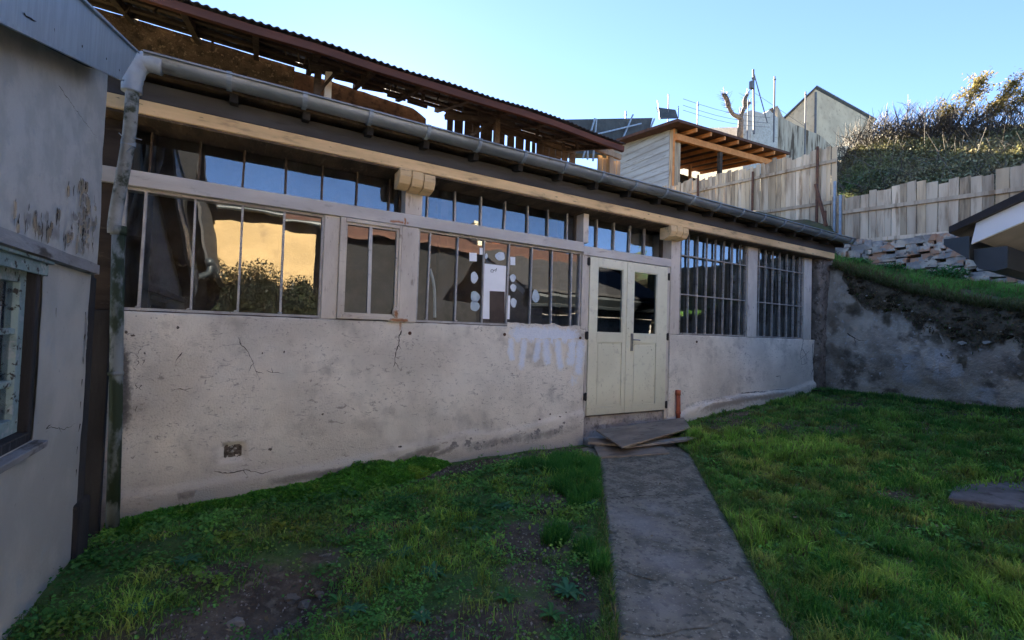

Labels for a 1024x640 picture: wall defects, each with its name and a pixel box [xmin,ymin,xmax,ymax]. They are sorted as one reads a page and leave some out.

peeling [14,178,97,257]
damp [262,415,649,489]